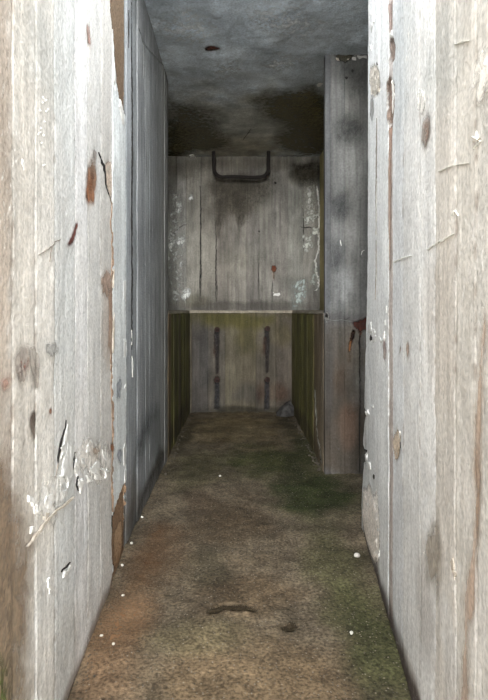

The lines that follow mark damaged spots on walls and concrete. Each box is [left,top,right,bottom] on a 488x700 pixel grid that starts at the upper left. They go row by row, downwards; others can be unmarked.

water stain [168,103,227,156]
corrosion [86,150,97,203]
water stain [258,83,324,303]
crack [98,2,164,512]
water stain [168,195,193,302]
corrosion [348,317,367,352]
peeling [79,438,114,483]
spalling [110,441,126,588]
crack [61,562,72,578]